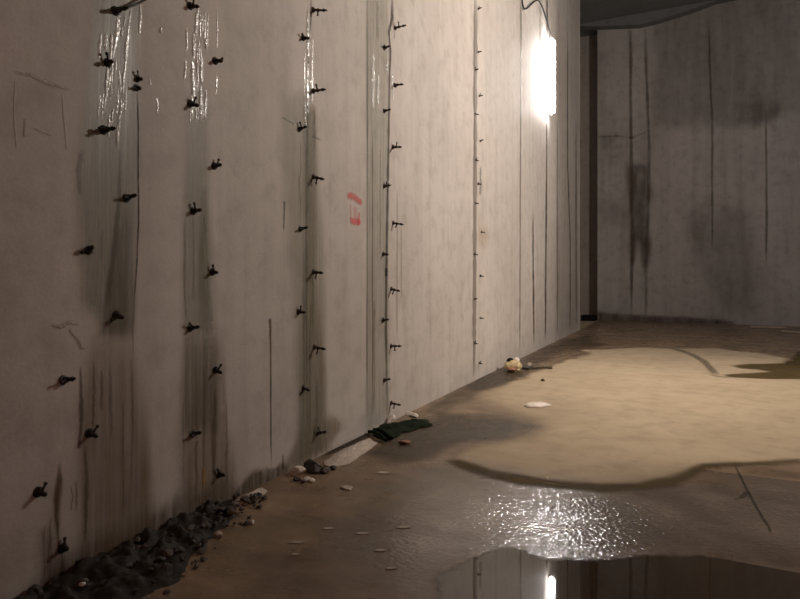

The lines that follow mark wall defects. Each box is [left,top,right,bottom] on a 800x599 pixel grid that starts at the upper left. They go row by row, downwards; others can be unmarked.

leakage [85,0,142,327]
crack [133,110,141,290]
leakage [184,8,219,123]
leakage [304,11,315,200]
crack [385,10,393,356]
crack [471,18,479,360]
leakage [629,169,649,288]
leakage [142,207,800,599]
crack [737,470,771,531]